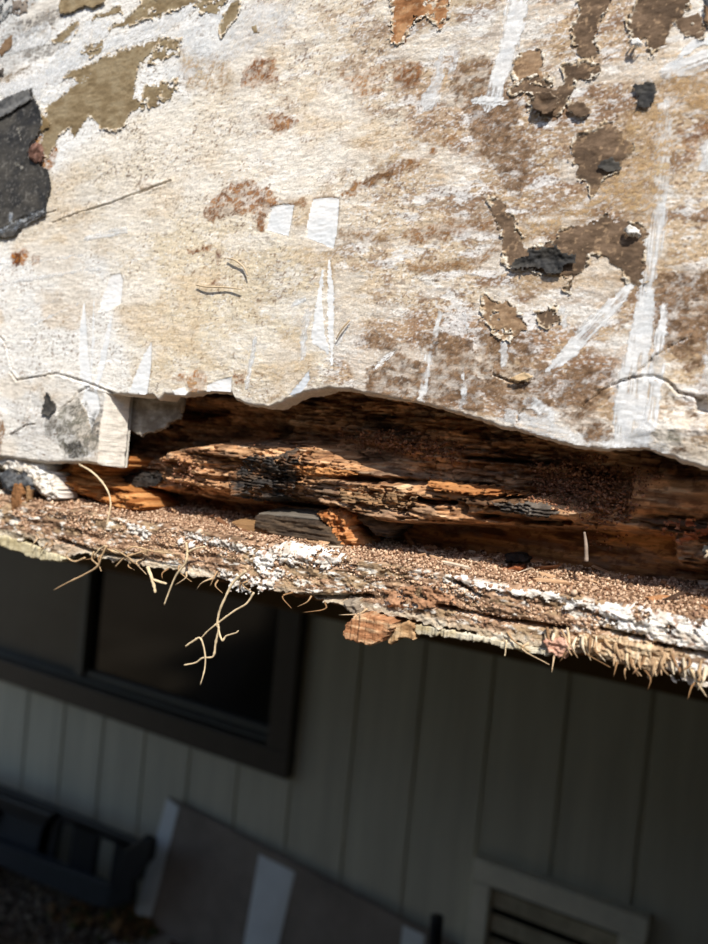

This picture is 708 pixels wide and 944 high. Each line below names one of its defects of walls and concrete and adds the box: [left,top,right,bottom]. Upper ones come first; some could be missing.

spalling [545,100,673,448]
spalling [207,377,232,392]
spalling [697,394,708,411]
peeling [122,520,152,538]
peeling [177,517,347,595]